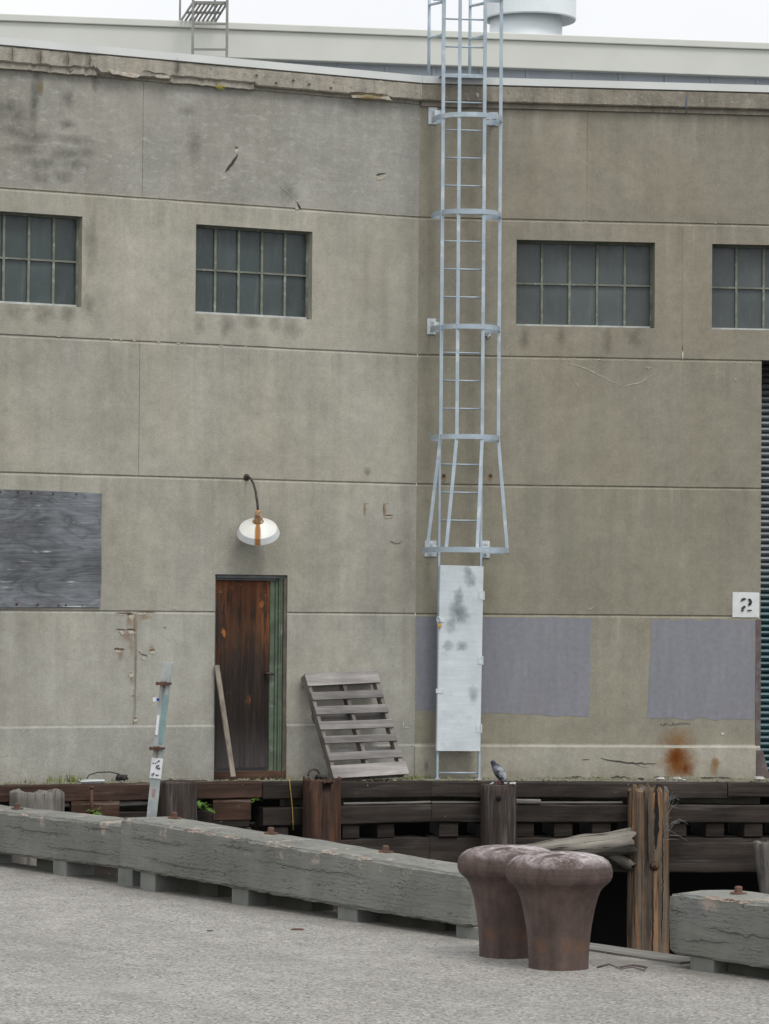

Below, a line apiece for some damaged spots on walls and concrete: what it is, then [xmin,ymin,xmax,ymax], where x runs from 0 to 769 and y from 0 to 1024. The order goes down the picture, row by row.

spalling [93,65,143,78]
spalling [350,92,399,101]
crack [564,758,669,779]
corrosion [670,749,689,773]